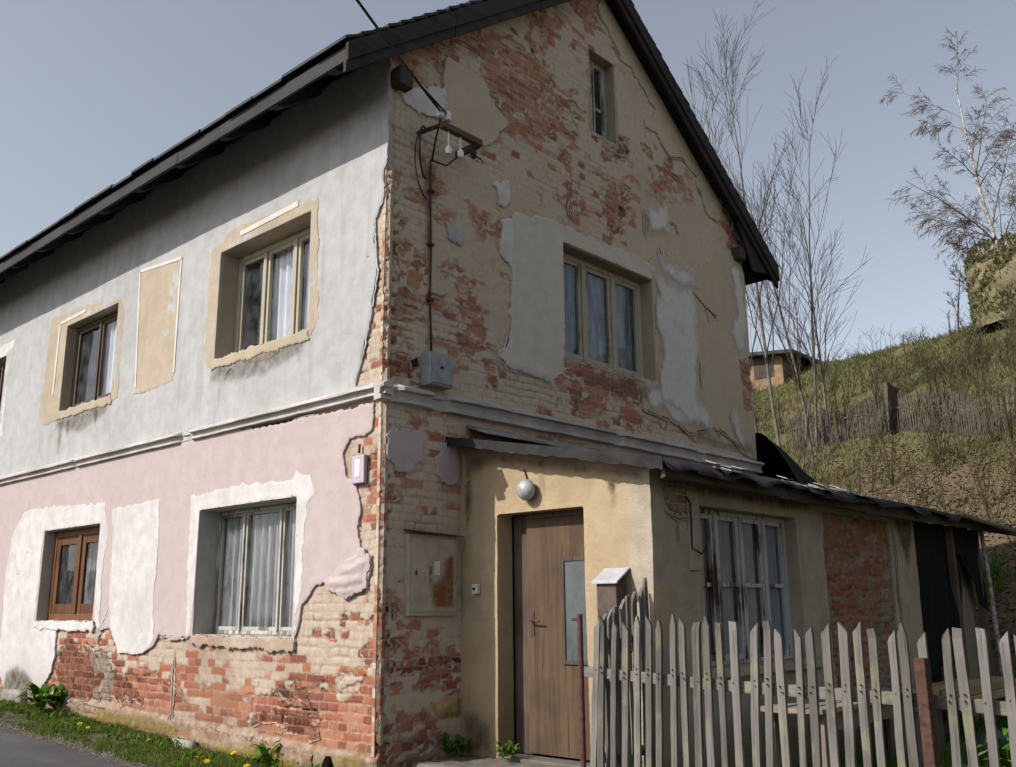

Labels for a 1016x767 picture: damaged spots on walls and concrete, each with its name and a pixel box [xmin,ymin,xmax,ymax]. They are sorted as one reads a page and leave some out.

spalling [395,30,651,163]
flaking render [492,180,515,270]
spalling [599,180,635,245]
spalling [383,172,499,380]
crack [692,290,719,322]
spalling [564,363,640,419]
crack [640,389,751,458]
spalling [740,362,755,421]
flaking render [364,429,460,509]
rust [430,557,453,606]
spalling [51,636,176,726]
spalling [247,588,461,767]